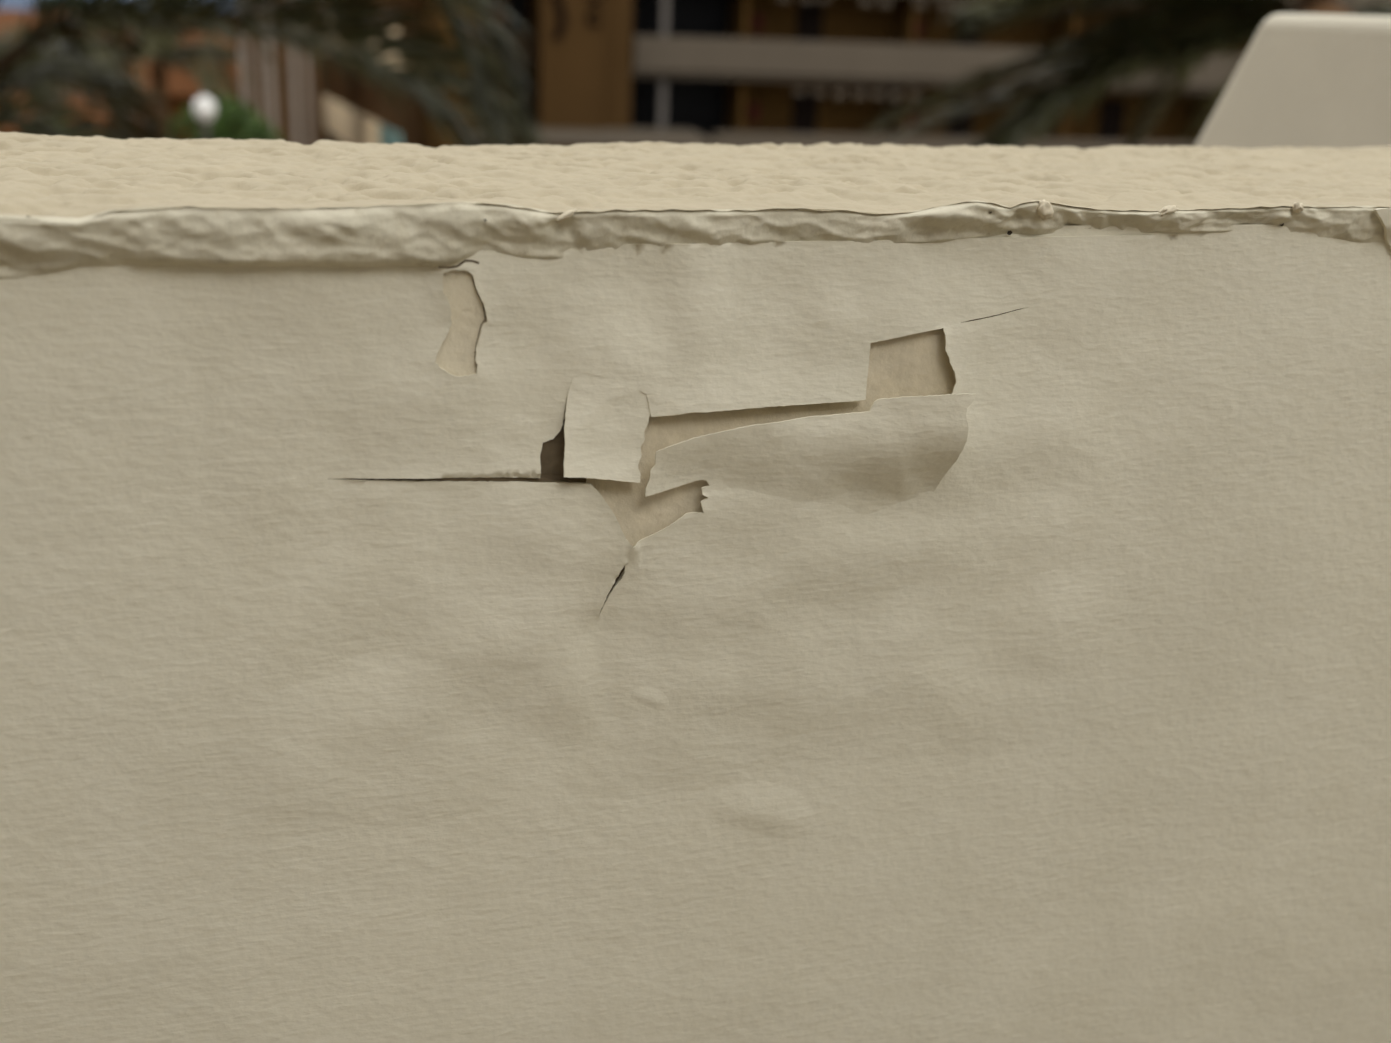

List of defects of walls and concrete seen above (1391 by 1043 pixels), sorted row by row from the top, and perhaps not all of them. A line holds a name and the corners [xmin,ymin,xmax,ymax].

spalling [435,270,487,376]
peeling [525,328,976,546]